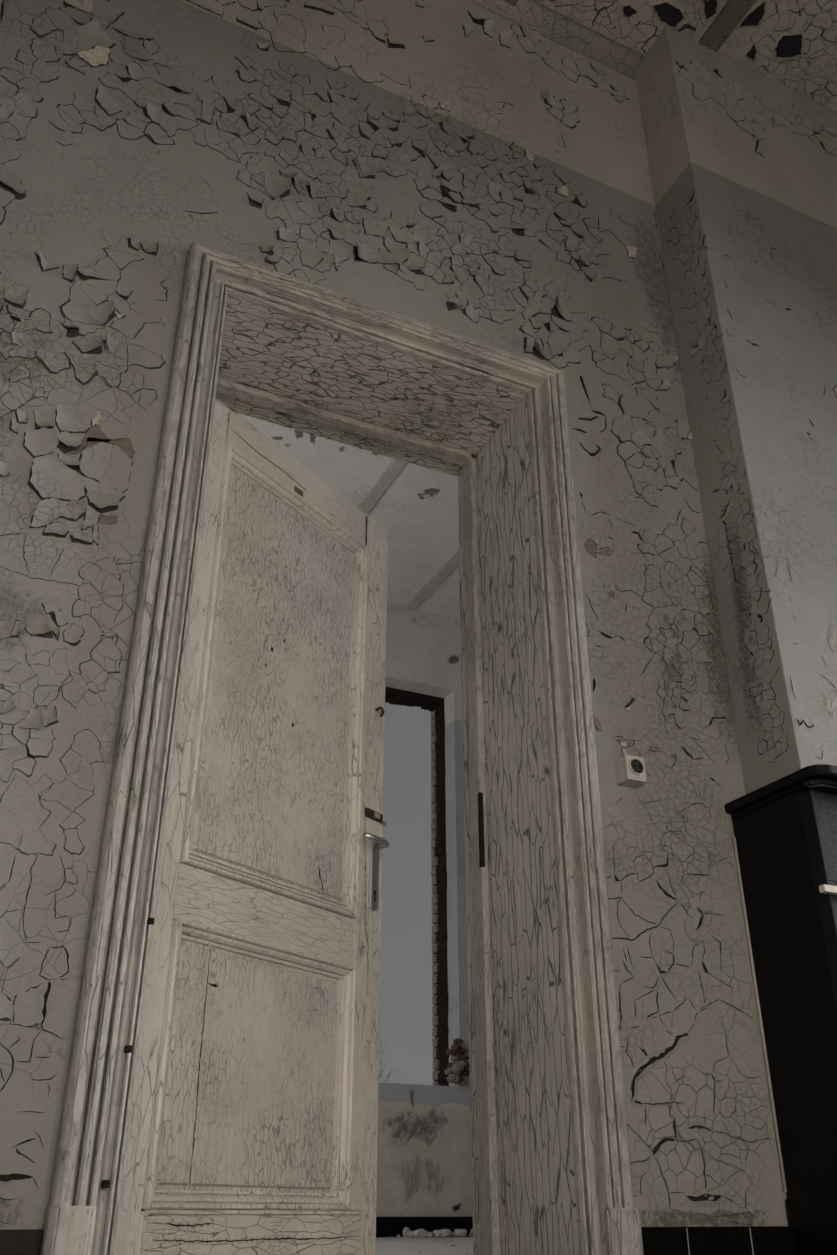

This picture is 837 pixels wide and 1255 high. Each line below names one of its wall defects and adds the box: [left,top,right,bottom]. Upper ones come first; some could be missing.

peeling [549,0,720,54]
spalling [736,0,805,63]
peeling [0,0,693,507]
crack [805,354,837,443]
crack [231,427,307,492]
peeling [0,229,166,856]
spalling [582,537,615,560]
crack [572,374,837,1210]
peeling [0,939,45,1026]
crack [0,850,78,1203]
crack [151,1220,356,1245]